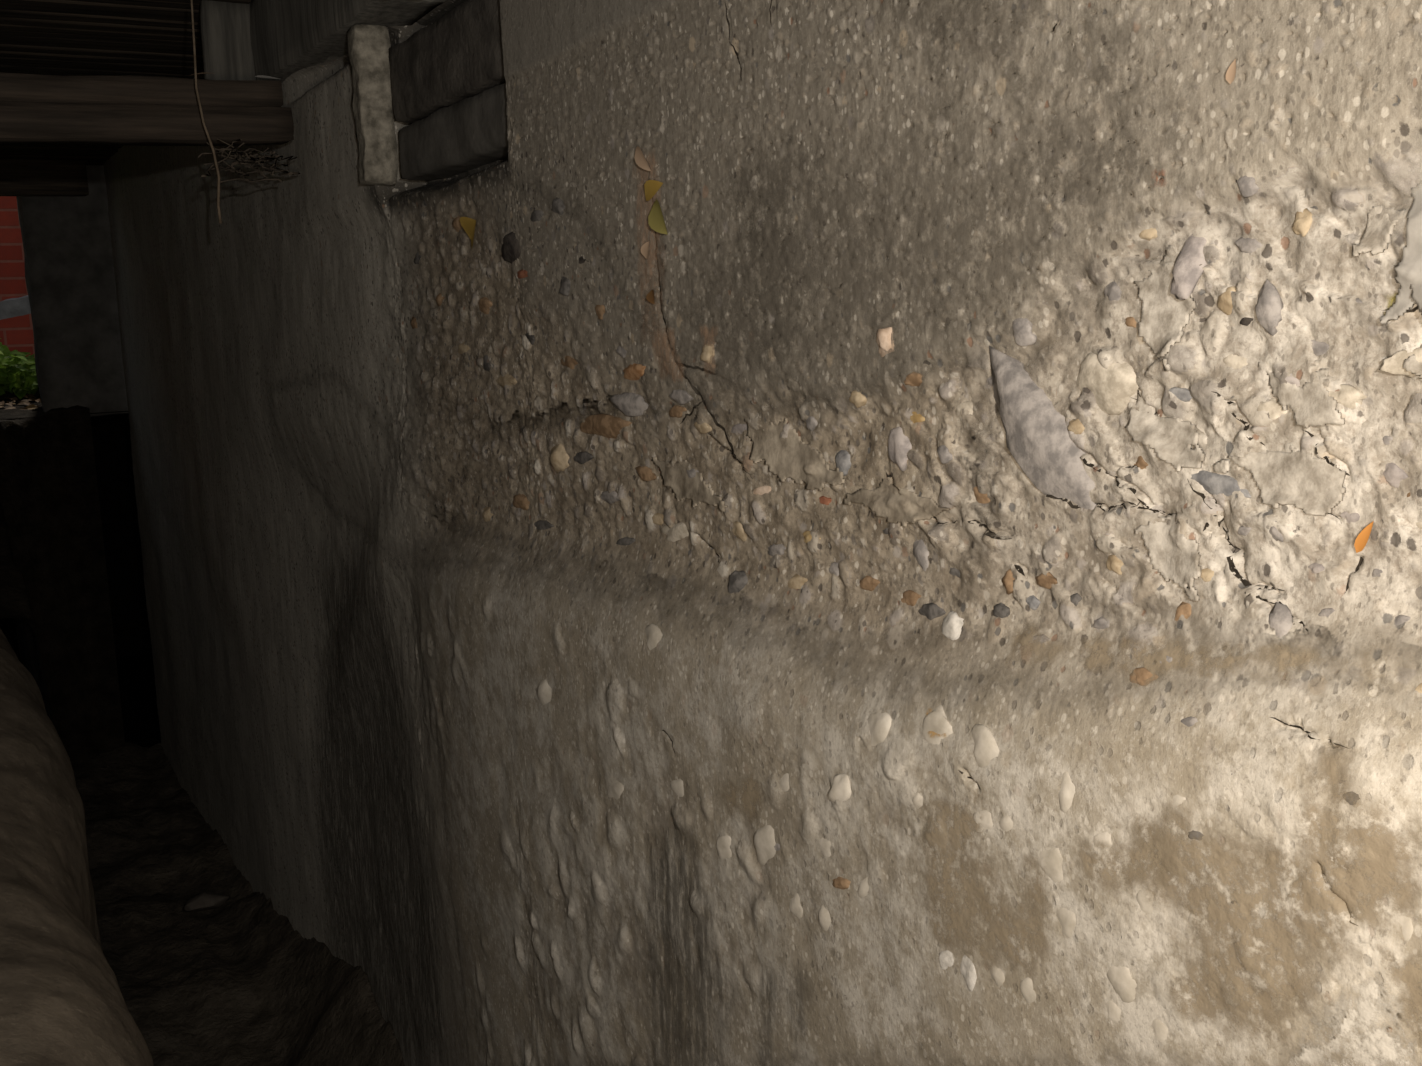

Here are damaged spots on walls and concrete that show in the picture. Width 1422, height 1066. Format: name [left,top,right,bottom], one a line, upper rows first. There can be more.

crack [725,3,742,80]
crack [647,156,752,478]
leakage [687,142,1093,388]
spalling [377,170,1422,660]
leakage [922,793,1046,972]
leakage [1079,754,1416,1032]
leakage [1295,955,1422,1066]